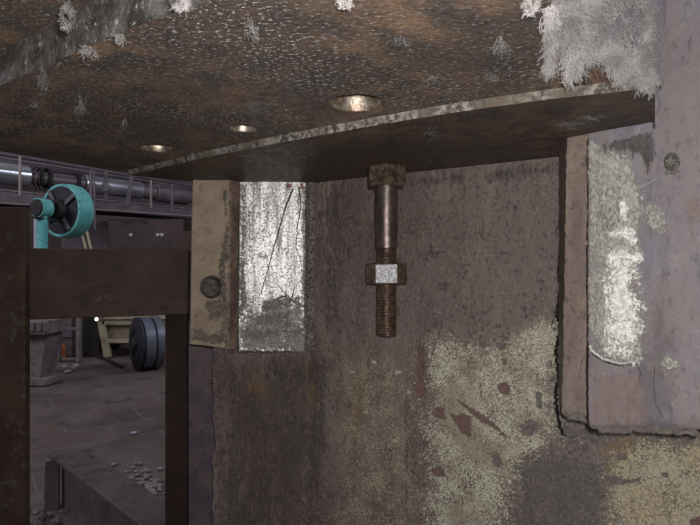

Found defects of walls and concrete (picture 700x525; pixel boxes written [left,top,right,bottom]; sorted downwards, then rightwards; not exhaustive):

crack [550,140,664,438]
damp [603,133,656,173]